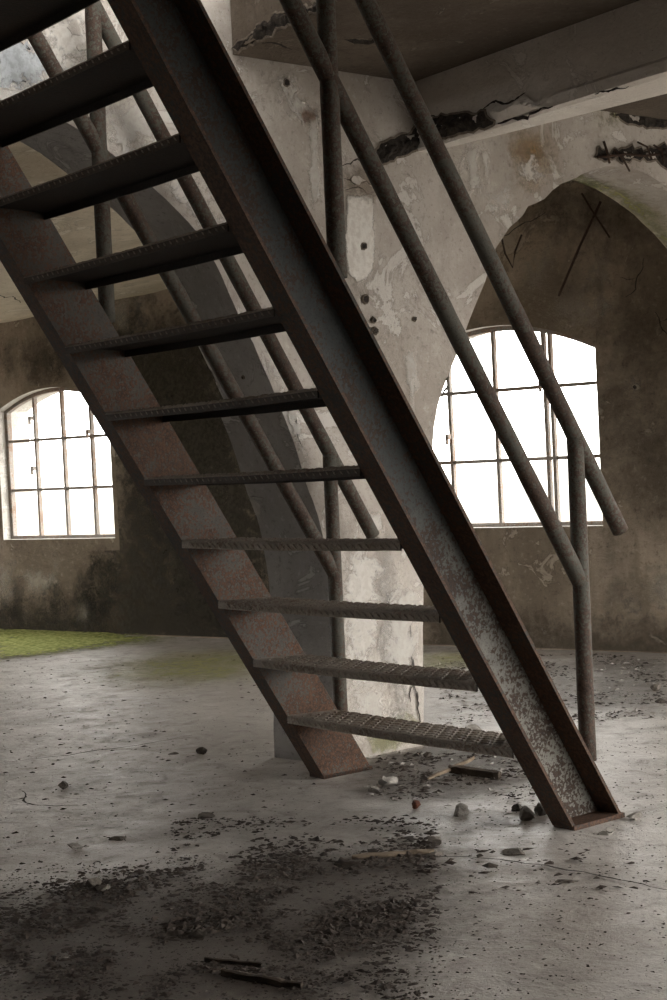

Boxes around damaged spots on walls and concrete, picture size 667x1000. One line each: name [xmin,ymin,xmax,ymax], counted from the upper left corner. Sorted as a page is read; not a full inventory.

spalling [375,125,420,166]
spalling [432,109,496,140]
flaking render [593,112,667,172]
damp [132,346,223,407]
damp [170,418,262,538]
damp [0,471,227,637]
damp [244,550,270,594]
crack [409,625,421,722]